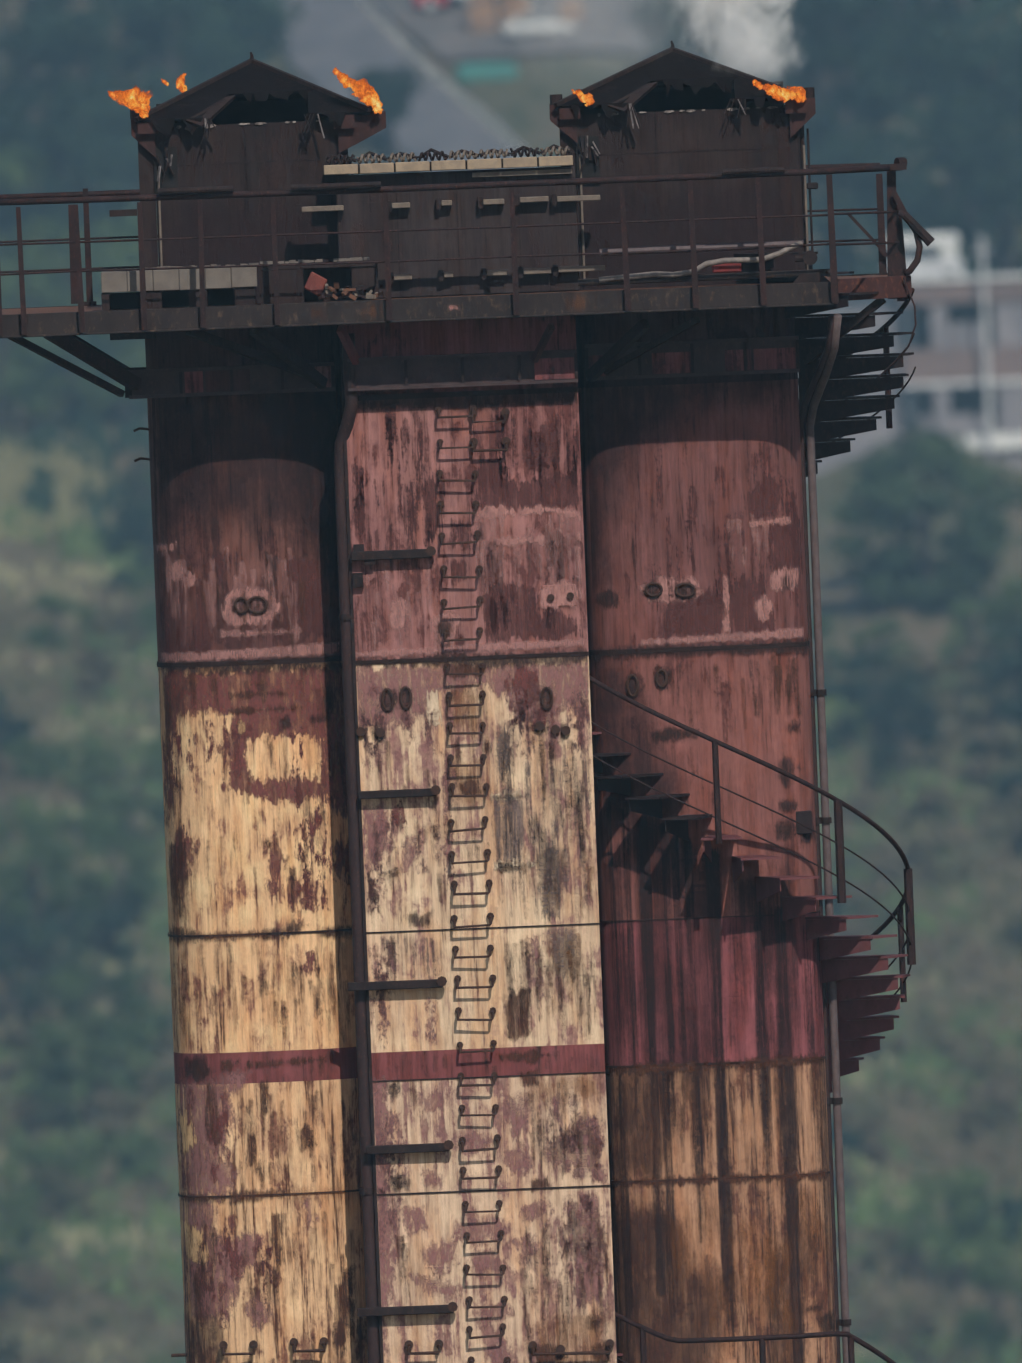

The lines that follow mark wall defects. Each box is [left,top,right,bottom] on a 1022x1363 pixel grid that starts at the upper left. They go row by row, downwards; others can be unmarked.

peeling [353,408,584,644]
corrosion [221,553,281,626]
peeling [156,540,590,924]
corrosion [169,833,302,956]
corrosion [293,950,320,1009]
corrosion [181,1127,290,1205]
corrosion [184,1056,323,1145]
corrosion [271,1214,283,1273]
corrosion [297,1123,317,1150]
peeling [374,1077,609,1357]
corrosion [610,1169,830,1205]
corrosion [332,1256,367,1362]